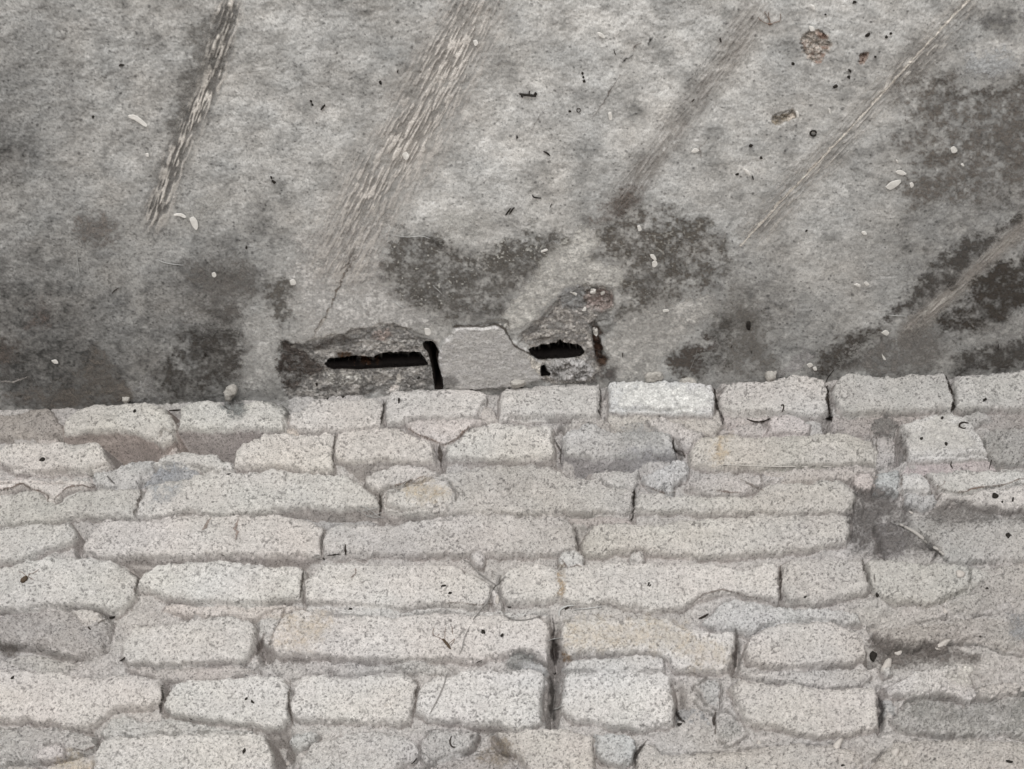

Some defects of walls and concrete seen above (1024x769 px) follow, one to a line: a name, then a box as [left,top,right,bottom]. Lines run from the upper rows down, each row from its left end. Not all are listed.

damp [0,347,132,409]
damp [155,262,293,403]
spalling [274,323,435,400]
damp [385,230,570,320]
spalling [519,285,614,384]
rust [590,326,607,367]
damp [589,187,731,319]
damp [812,214,1024,377]